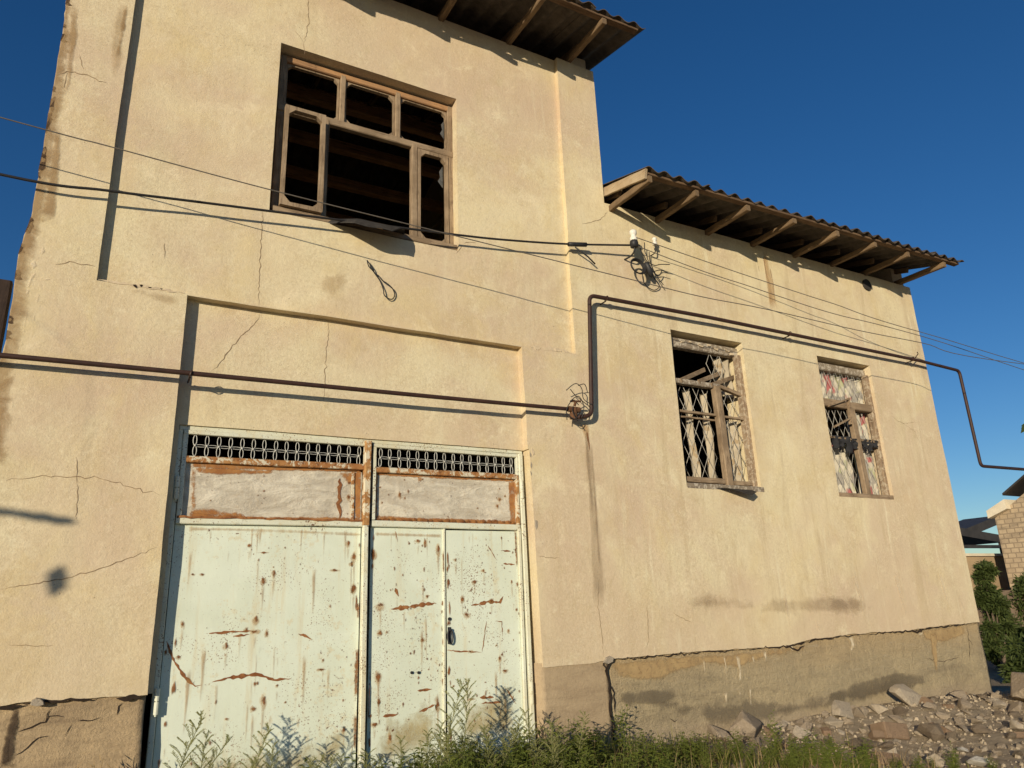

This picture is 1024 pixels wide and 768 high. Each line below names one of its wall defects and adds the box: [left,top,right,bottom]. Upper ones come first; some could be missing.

damp [0,5,76,366]
crack [214,223,262,369]
crack [8,457,159,519]
corrosion [375,473,517,588]
crack [8,547,156,588]
corrosion [165,639,200,693]
corrosion [206,616,268,648]
corrosion [213,672,294,686]
corrosion [324,567,520,760]
flaking render [615,647,803,679]
crack [0,694,142,756]